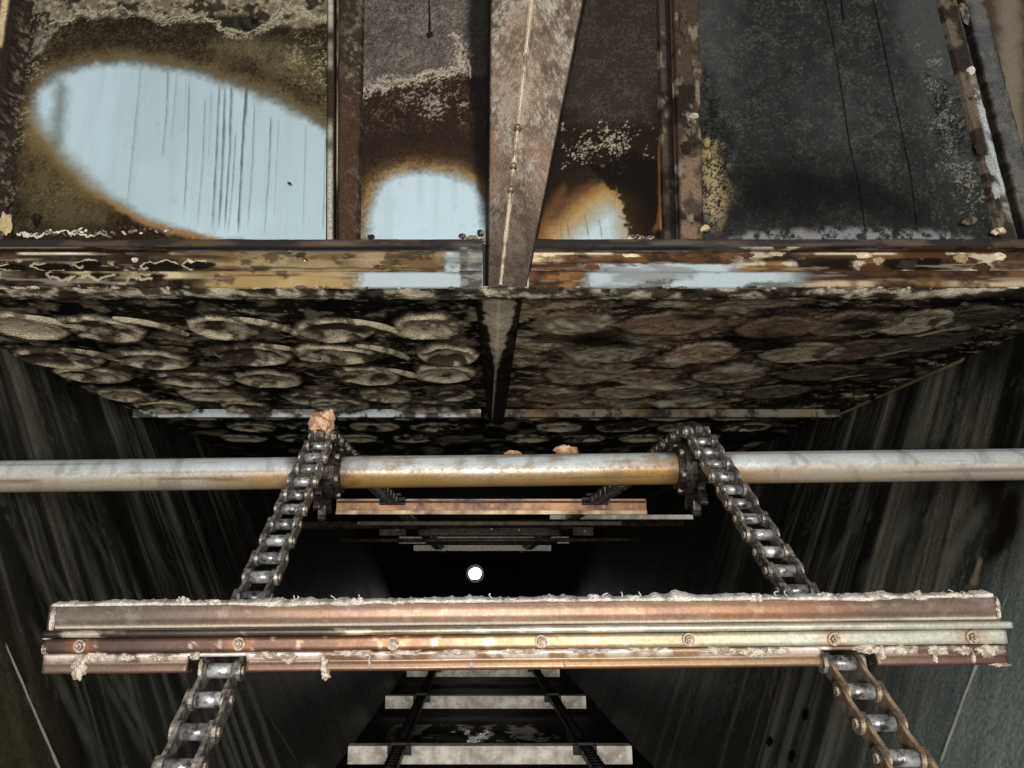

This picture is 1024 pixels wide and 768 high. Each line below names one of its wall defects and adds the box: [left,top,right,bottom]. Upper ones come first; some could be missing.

leakage [213,88,247,223]
peeling [539,253,600,270]
peeling [856,253,885,266]
peeling [953,252,1007,271]